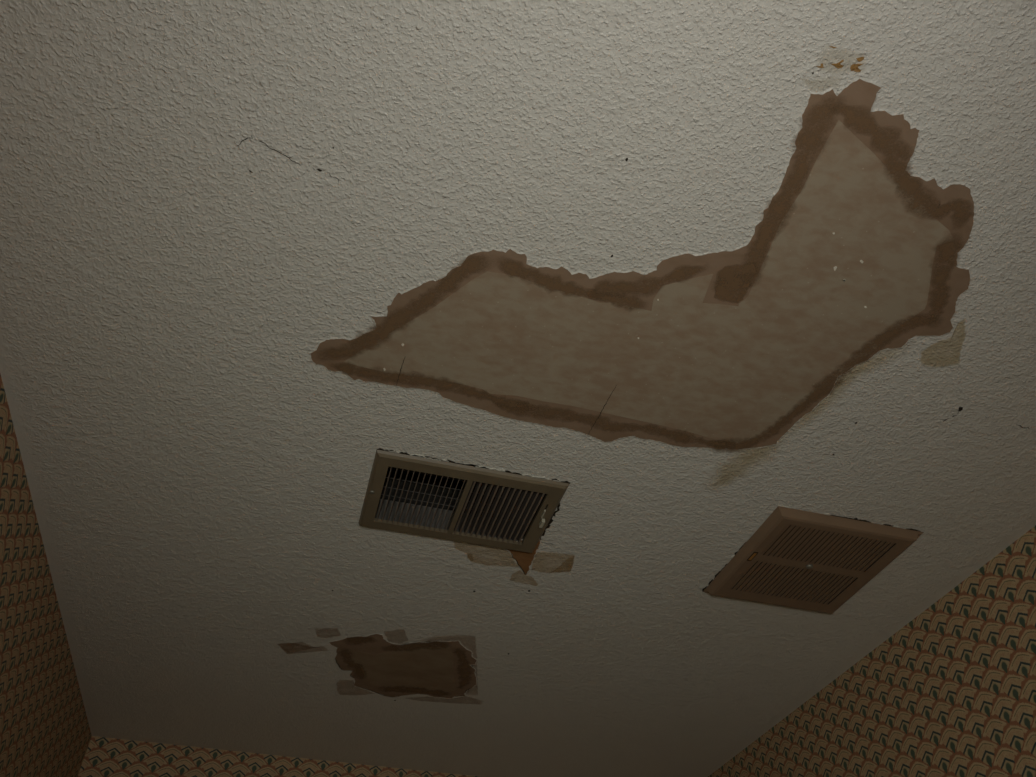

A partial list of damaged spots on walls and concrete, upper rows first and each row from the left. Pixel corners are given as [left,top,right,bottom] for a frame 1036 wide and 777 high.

peeling [308,76,977,451]
peeling [328,633,478,701]